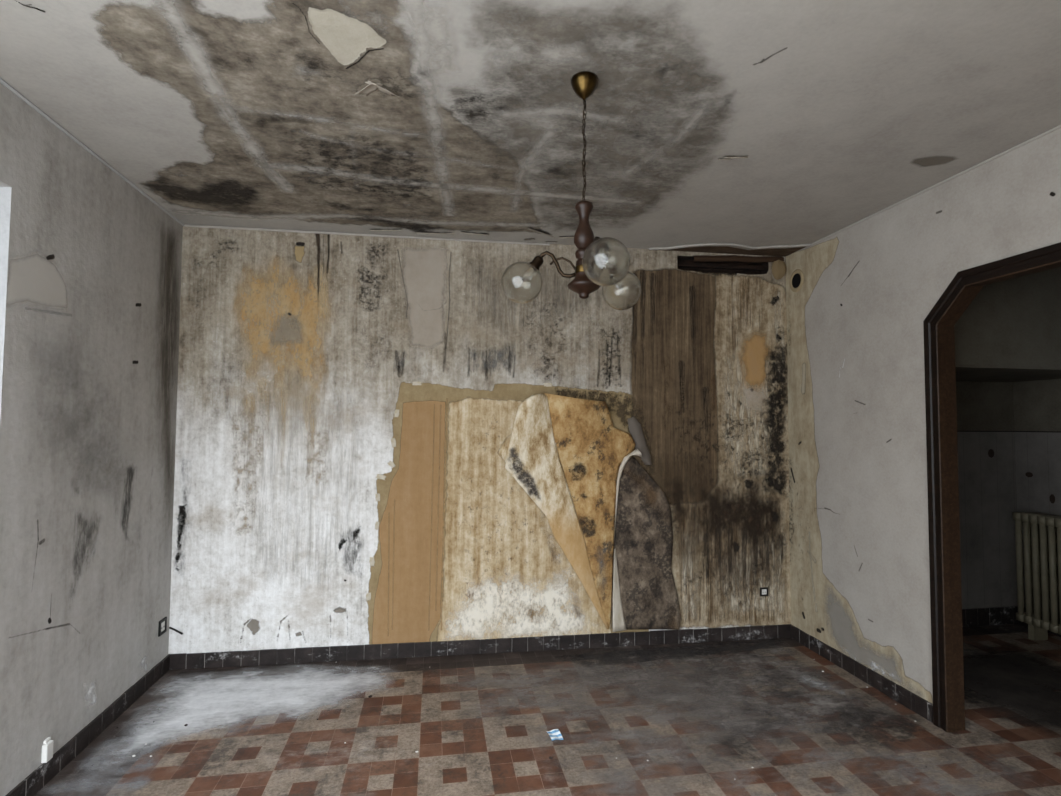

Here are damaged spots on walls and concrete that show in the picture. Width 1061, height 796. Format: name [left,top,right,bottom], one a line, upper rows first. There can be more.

flaking render [292,3,387,69]
leakage [95,0,725,233]
leakage [235,263,329,490]
leakage [175,491,187,571]
leakage [338,529,361,581]
peeling [366,381,654,644]
mould [509,448,539,498]
mould [572,463,586,480]
mould [579,518,596,537]
leakage [598,268,791,628]
flaking render [649,237,933,704]
leakage [240,619,260,639]